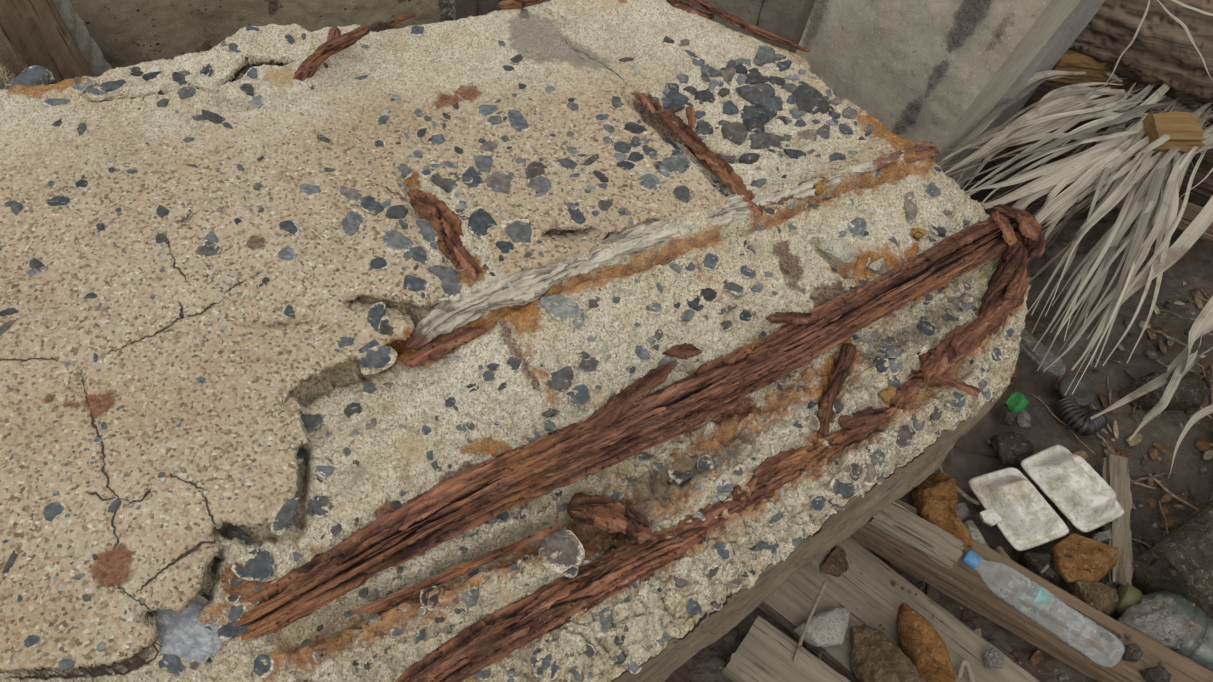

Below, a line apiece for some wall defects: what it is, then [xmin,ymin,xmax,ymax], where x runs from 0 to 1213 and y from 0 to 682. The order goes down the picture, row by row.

spalling [5,23,361,126]
rust [267,0,416,84]
rust [666,0,809,52]
rust [90,545,132,587]
crack [1,241,262,681]
spalling [0,45,1031,682]
rust [221,204,1046,682]
rust [390,92,940,389]